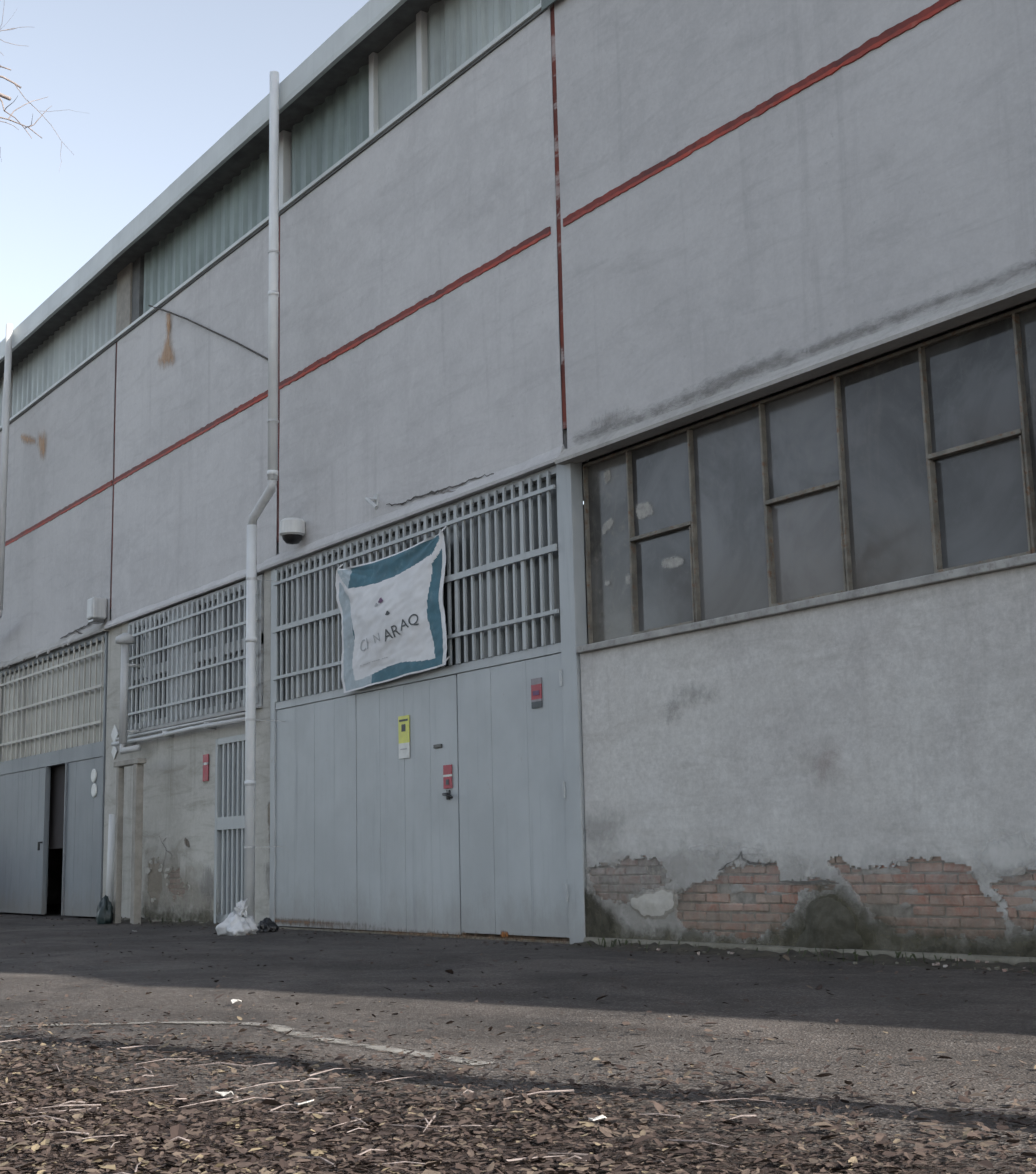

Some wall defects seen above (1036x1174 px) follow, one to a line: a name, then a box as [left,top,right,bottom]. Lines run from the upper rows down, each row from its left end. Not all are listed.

corrosion [161,314,173,363]
leakage [981,834,1036,875]
leakage [584,887,1036,957]
flaking render [586,855,1036,942]